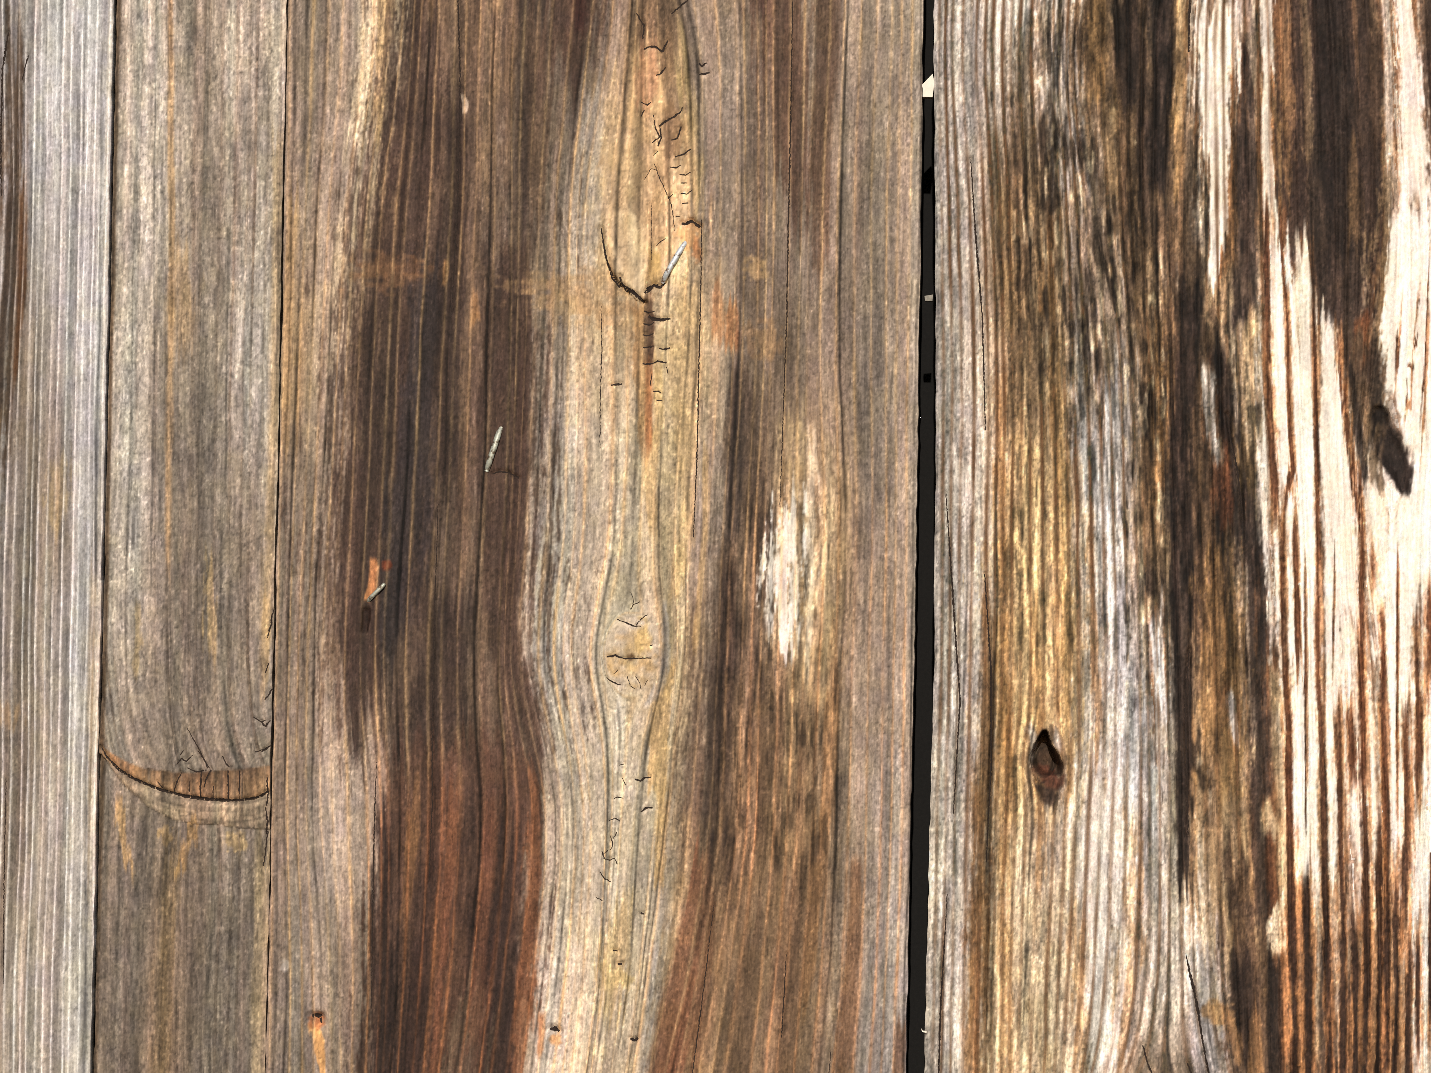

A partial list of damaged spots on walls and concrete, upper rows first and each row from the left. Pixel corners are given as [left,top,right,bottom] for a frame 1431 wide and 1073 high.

crack [599,0,710,537]
crack [102,609,274,866]